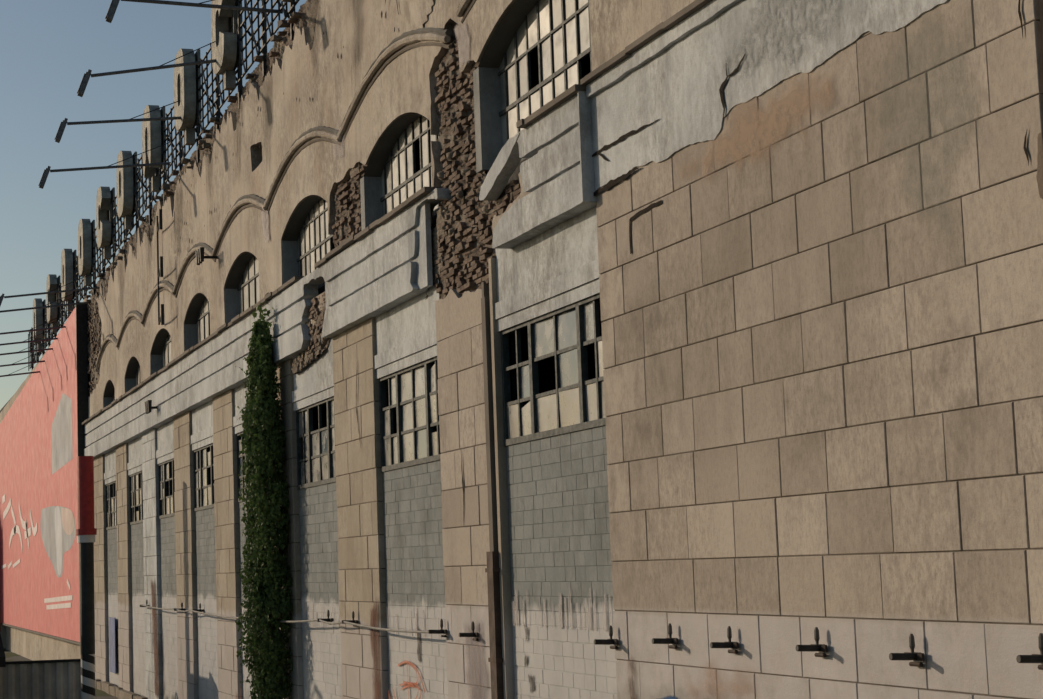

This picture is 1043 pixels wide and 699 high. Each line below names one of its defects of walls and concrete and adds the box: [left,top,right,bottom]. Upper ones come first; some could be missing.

crack [719,54,745,118]
flaking render [425,24,522,302]
crack [592,119,659,196]
flaking render [332,163,367,248]
crack [629,200,662,254]
flaking render [291,293,329,374]
rust [370,602,381,699]